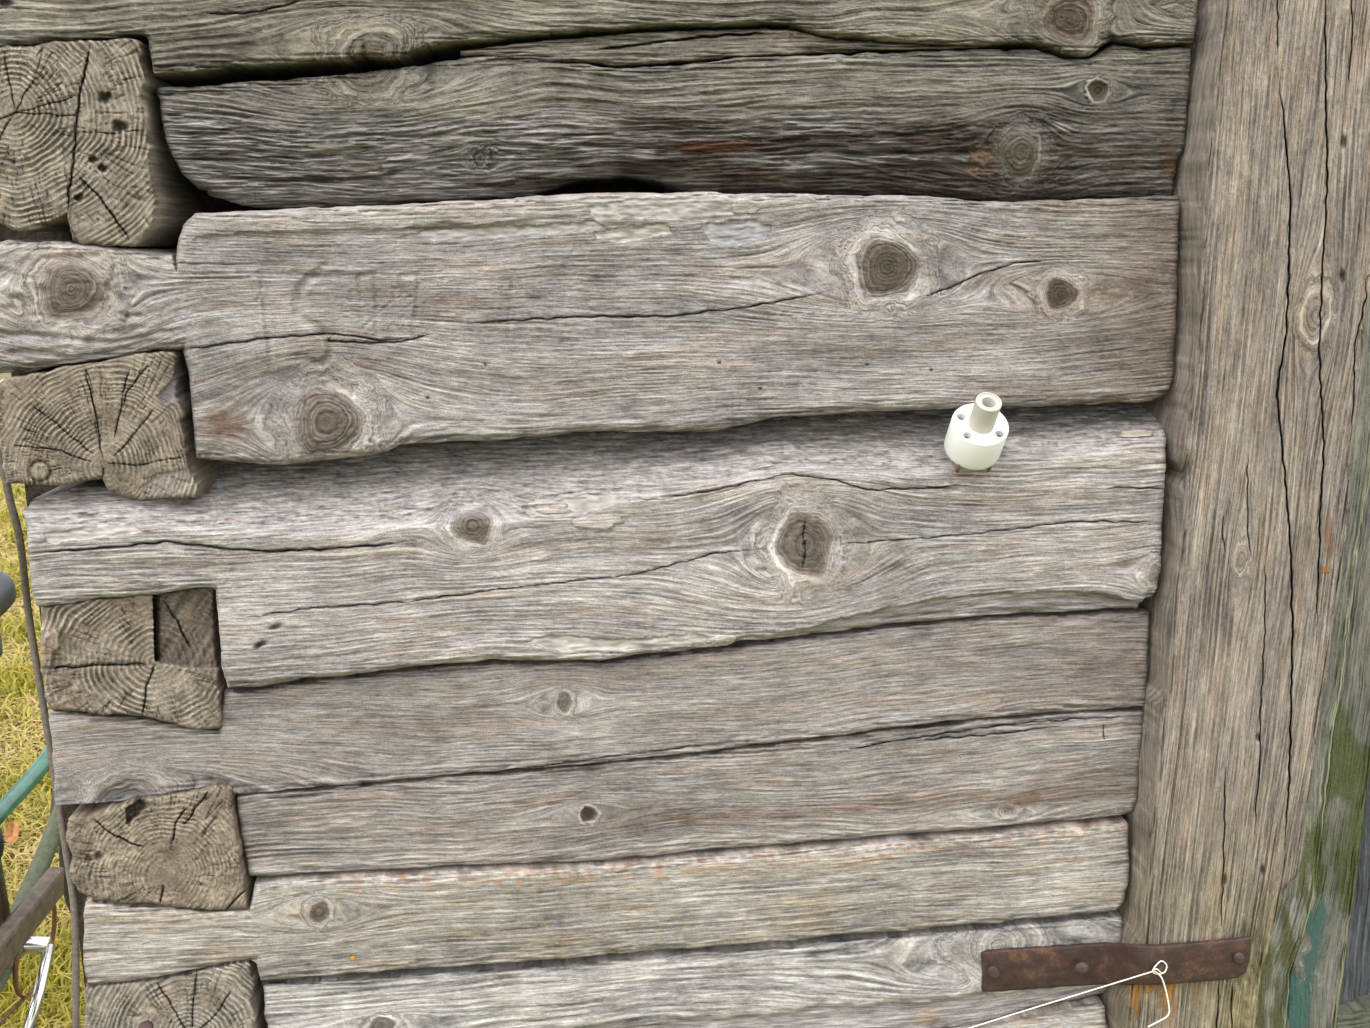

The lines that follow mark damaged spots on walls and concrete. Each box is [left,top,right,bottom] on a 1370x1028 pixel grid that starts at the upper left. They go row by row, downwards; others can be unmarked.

crack [928,260,1044,296]
crack [468,292,824,324]
crack [182,333,427,349]
crack [1221,0,1367,925]
crack [843,487,1163,544]